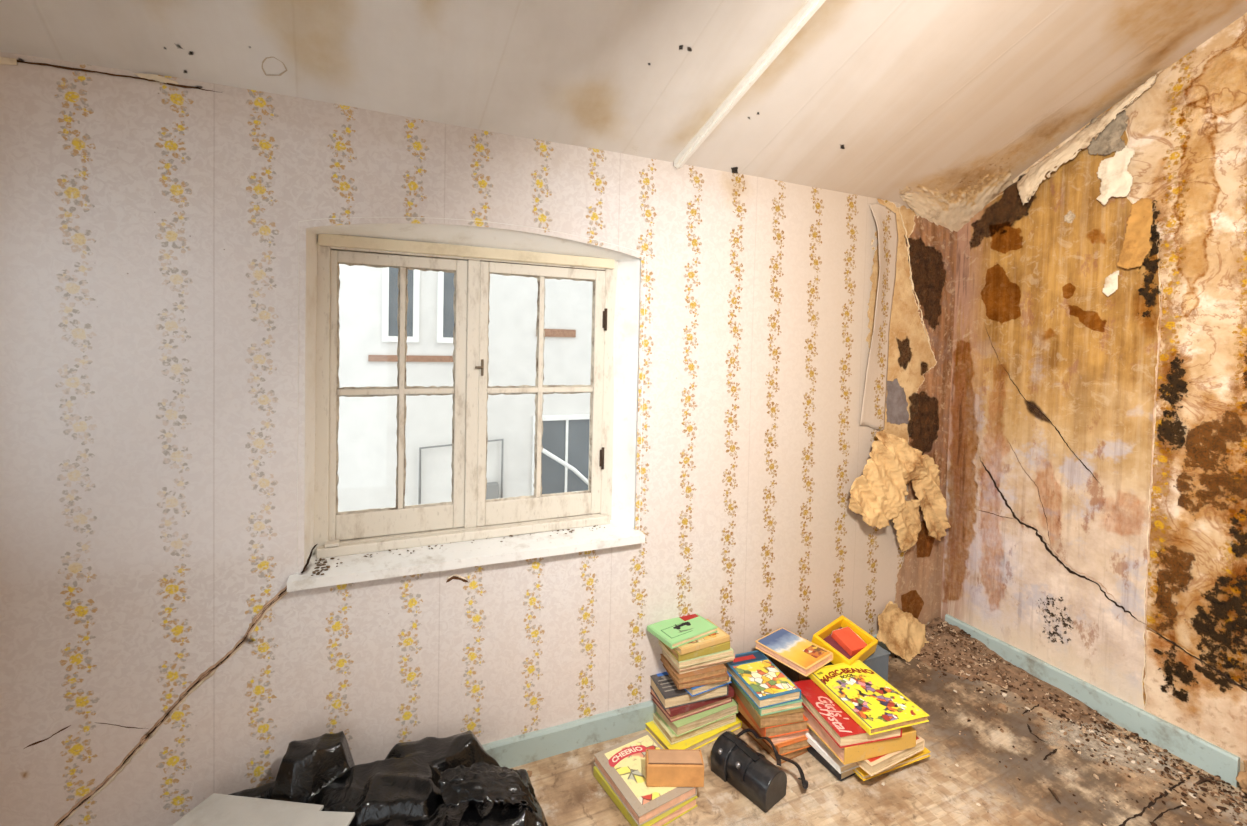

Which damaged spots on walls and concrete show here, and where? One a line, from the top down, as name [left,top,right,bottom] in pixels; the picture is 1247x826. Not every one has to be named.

crack [0,56,216,92]
crack [24,544,317,826]
crack [986,329,1101,485]
peeling [849,107,1247,763]
crack [979,438,1247,690]
crack [1119,769,1203,826]
water stain [1153,345,1247,702]